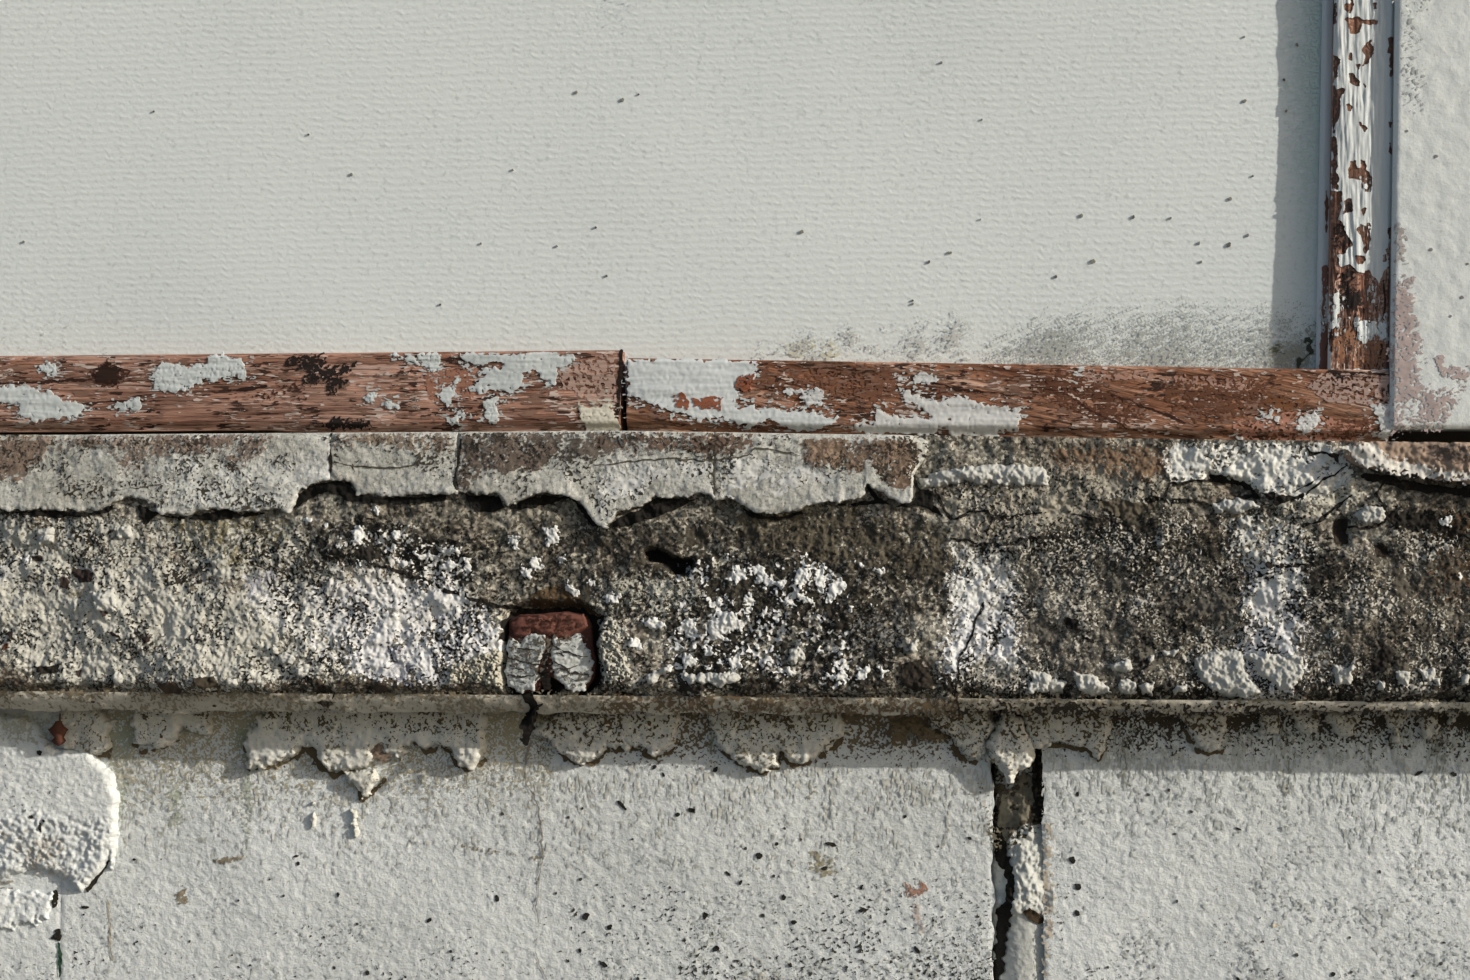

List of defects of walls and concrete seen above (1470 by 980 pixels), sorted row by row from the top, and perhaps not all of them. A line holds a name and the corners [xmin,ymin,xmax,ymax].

peeling [1319,0,1470,436]
peeling [673,373,755,411]
peeling [0,434,274,482]
peeling [797,436,922,496]
spalling [1209,474,1276,500]
crack [1273,448,1470,530]
leakage [242,569,284,600]
crack [1272,561,1320,569]
leakage [833,598,909,656]
crack [373,562,604,979]
leakage [0,613,1470,980]
crack [992,749,1044,980]